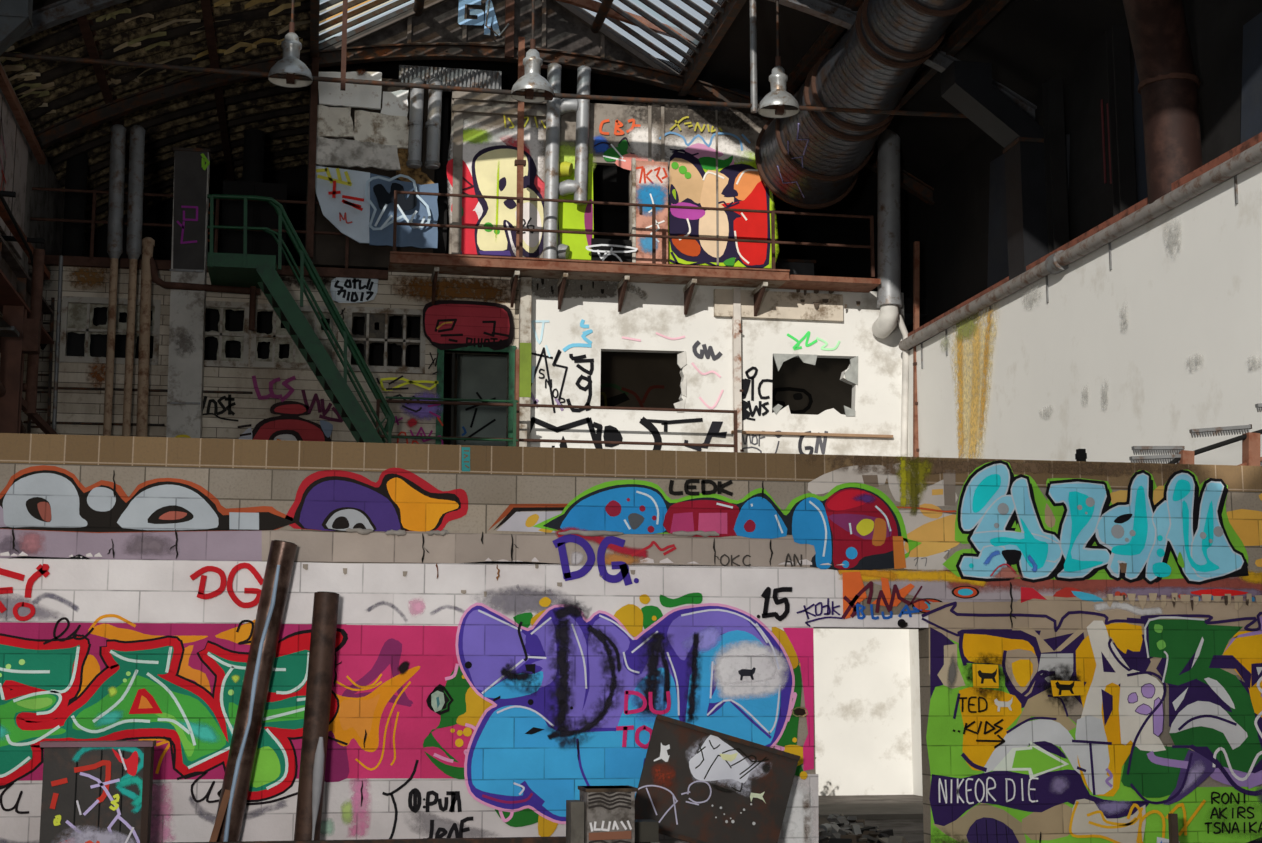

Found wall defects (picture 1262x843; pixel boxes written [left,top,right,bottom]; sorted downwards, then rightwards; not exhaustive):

peeling [673,351,687,412]
peeling [773,353,817,371]
peeling [844,356,858,385]
corrosion [952,308,996,459]